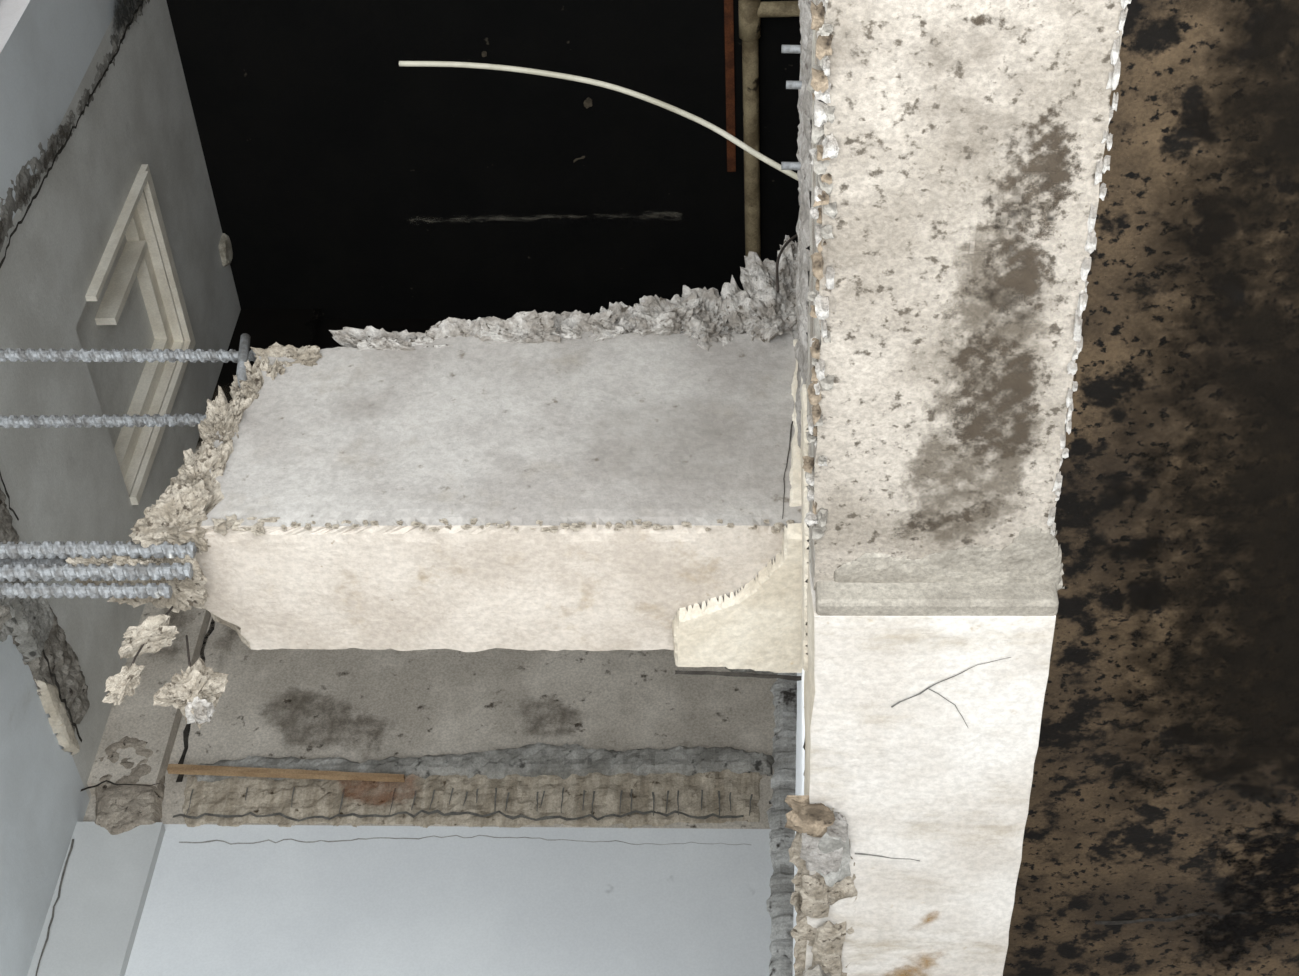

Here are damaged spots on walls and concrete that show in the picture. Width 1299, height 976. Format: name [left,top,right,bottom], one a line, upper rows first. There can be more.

flaking render [0,0,150,268]
damp [1040,149,1081,205]
spalling [329,0,839,681]
damp [947,234,1056,467]
spalling [0,472,19,544]
spalling [212,514,379,536]
damp [907,502,991,532]
spalling [4,579,90,755]
crack [200,620,215,663]
crack [176,723,191,782]
spalling [80,736,774,835]
spalling [785,795,858,976]